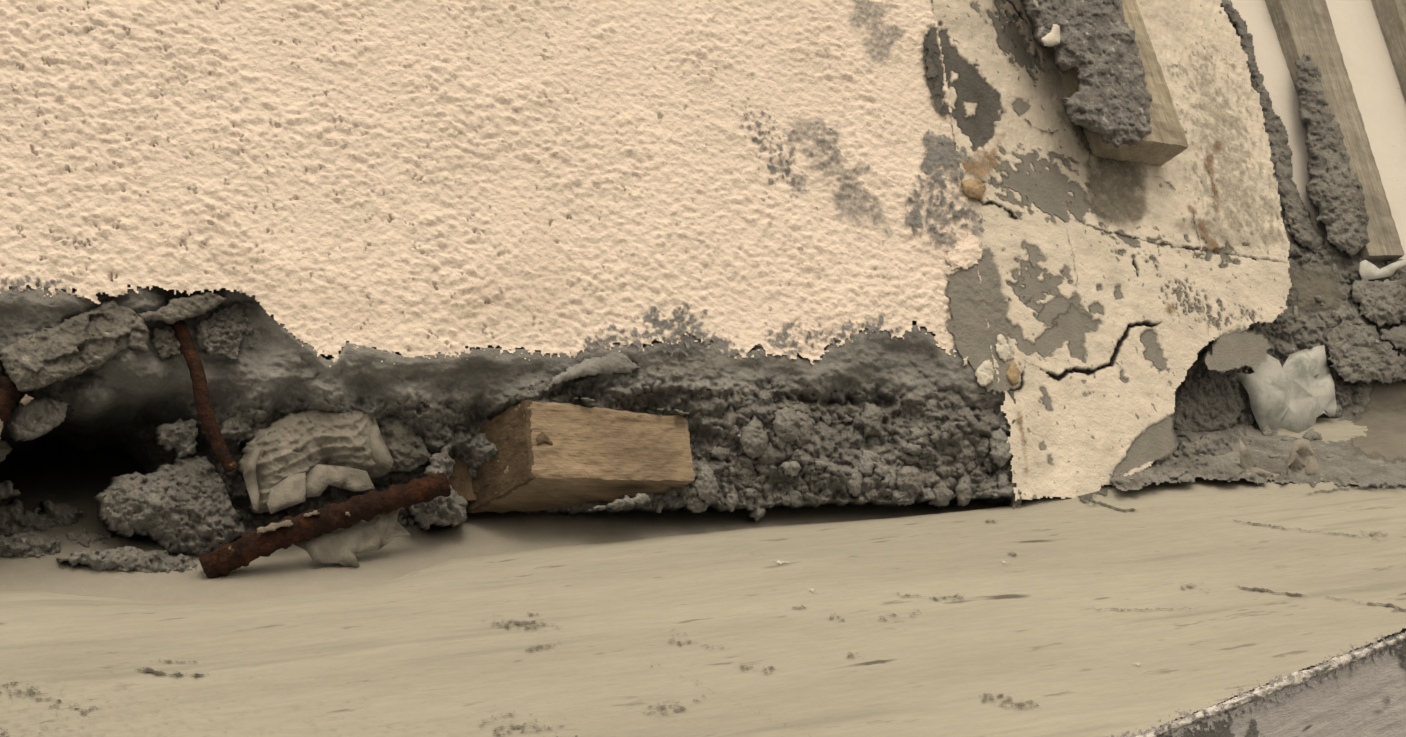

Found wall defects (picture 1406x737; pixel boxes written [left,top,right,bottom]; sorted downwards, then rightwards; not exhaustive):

peeling [971,0,1042,81]
peeling [741,98,888,233]
peeling [0,276,66,298]
spalling [905,22,1406,503]
spalling [0,376,34,440]
spalling [171,320,238,473]
crack [1009,316,1159,391]
spalling [1111,633,1406,737]